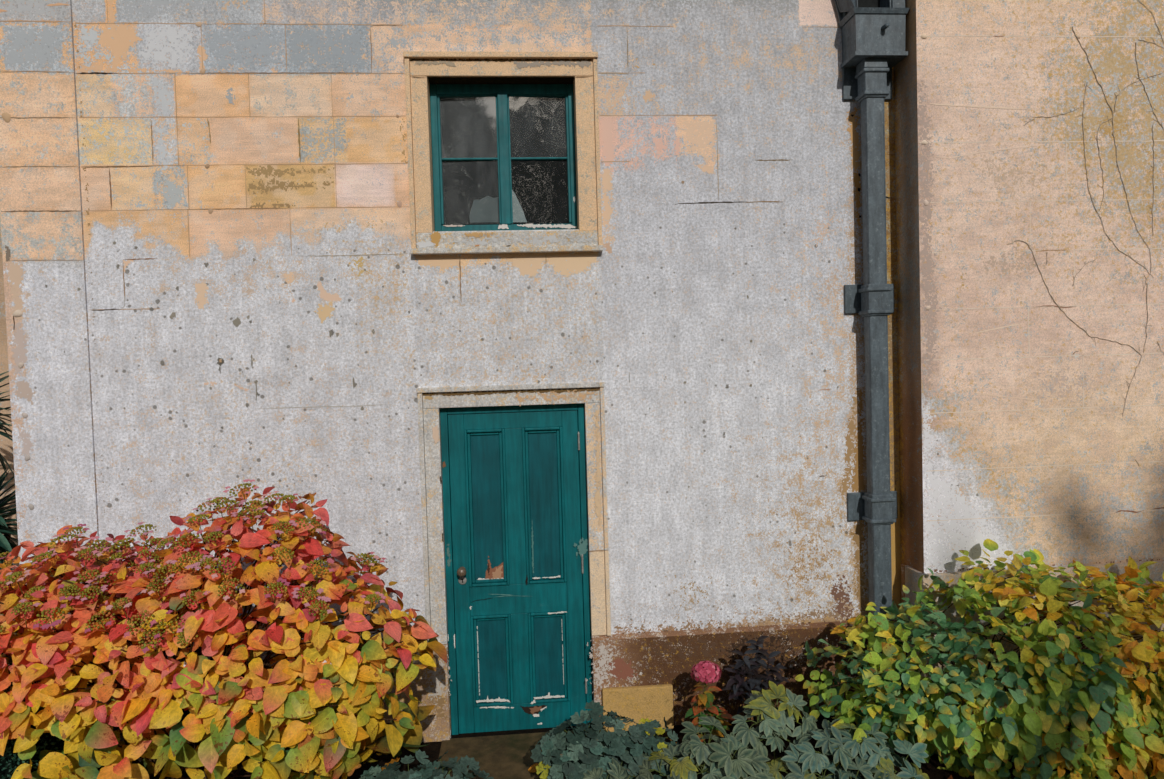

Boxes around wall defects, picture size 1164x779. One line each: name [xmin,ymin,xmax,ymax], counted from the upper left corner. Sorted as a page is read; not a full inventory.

peeling [76,0,208,75]
peeling [5,245,40,405]
peeling [194,281,209,310]
peeling [508,242,612,278]
water stain [614,575,854,692]